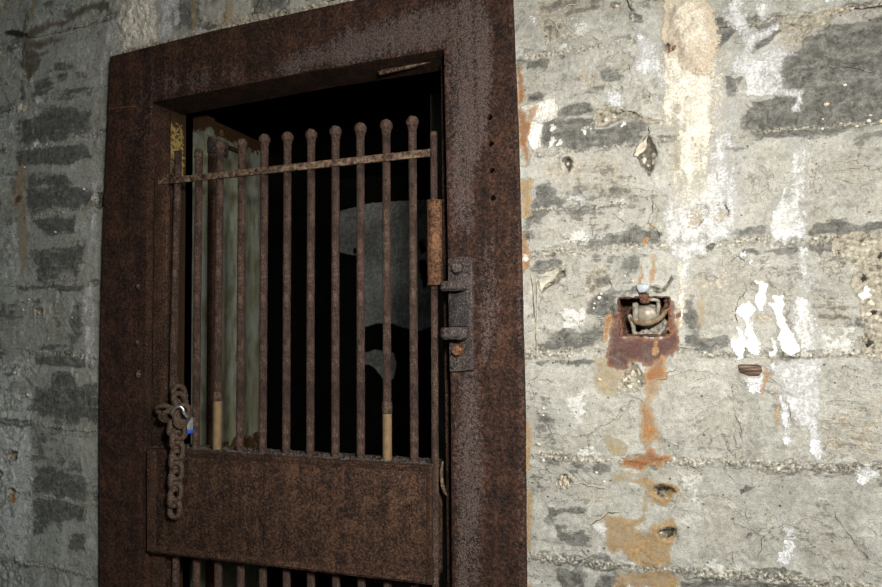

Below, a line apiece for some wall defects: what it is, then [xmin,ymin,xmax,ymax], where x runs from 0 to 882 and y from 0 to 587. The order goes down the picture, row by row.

rust [517,65,538,166]
spalling [592,105,665,176]
rust [520,178,534,218]
rust [522,234,531,270]
spalling [831,231,882,359]
rust [596,301,680,587]